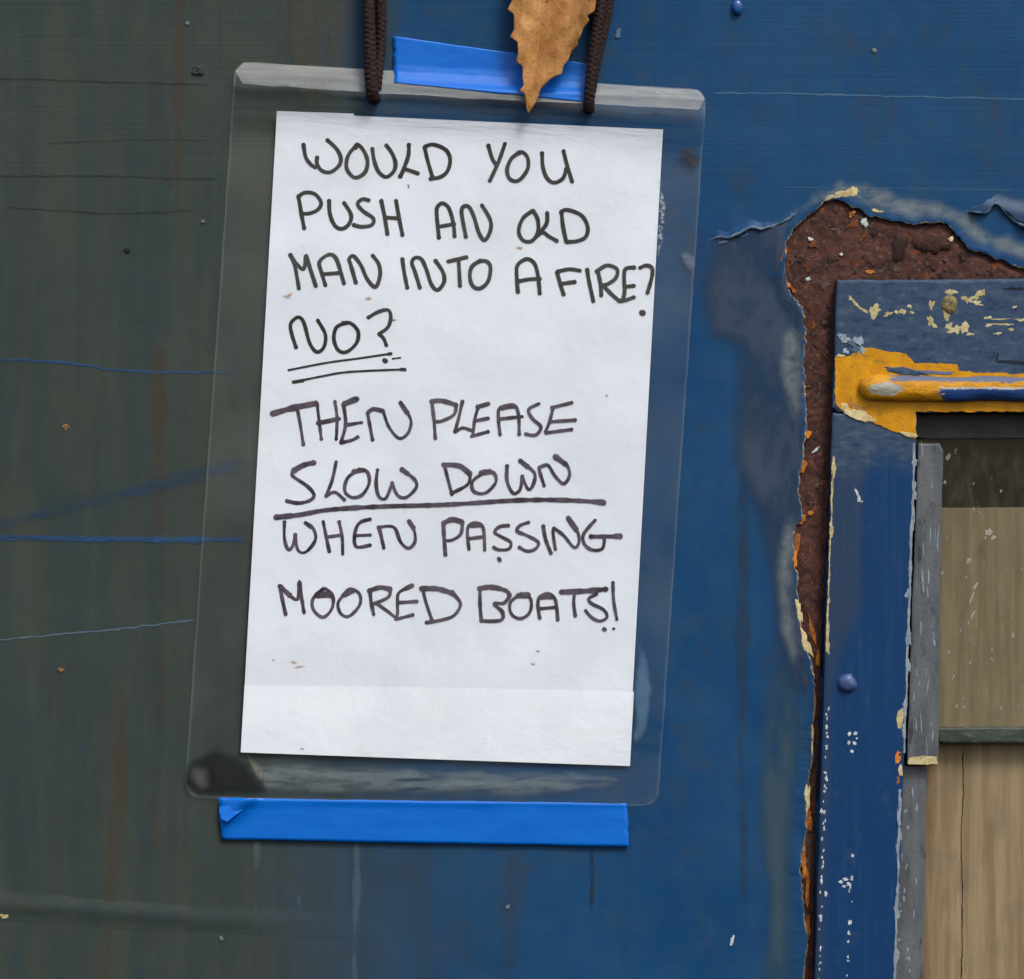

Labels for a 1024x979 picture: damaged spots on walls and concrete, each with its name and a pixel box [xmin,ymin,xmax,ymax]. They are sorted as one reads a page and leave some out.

peeling [966,193,1024,227]
peeling [849,295,914,320]
peeling [927,300,974,335]
peeling [944,289,1024,335]
peeling [834,333,1024,753]
rust [770,181,1024,979]